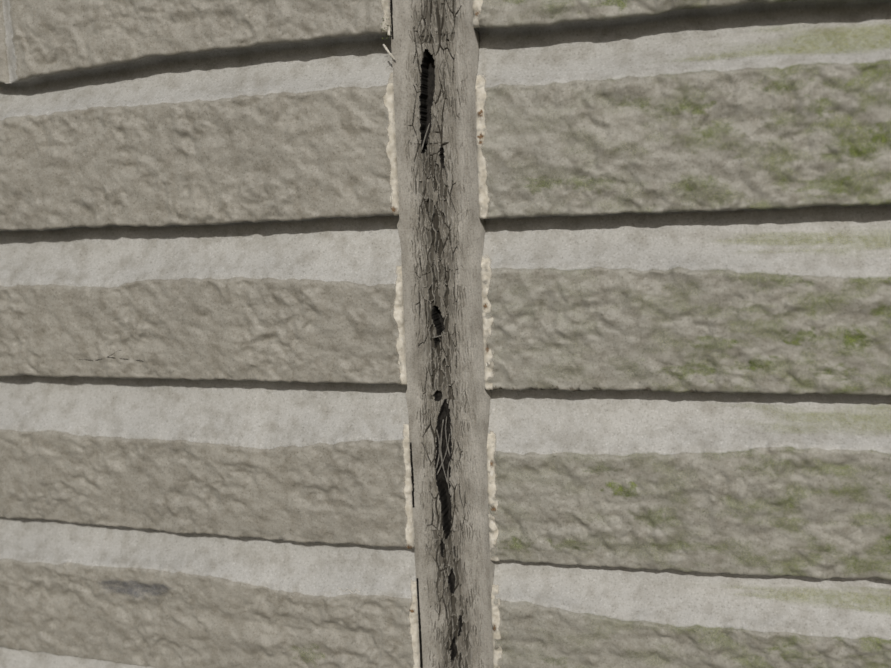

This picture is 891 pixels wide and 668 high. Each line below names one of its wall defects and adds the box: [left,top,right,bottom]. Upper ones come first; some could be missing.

crack [390,0,486,668]